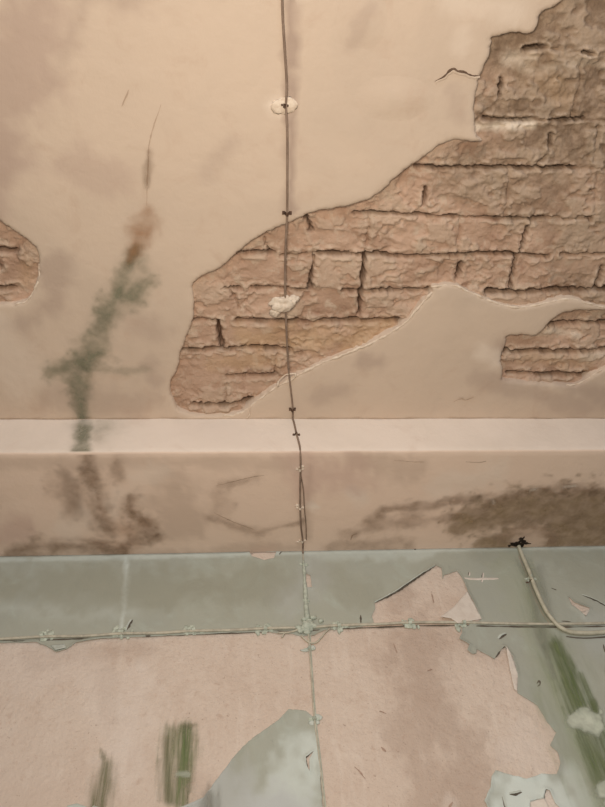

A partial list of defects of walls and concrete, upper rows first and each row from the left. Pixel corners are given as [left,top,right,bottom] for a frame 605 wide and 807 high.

spalling [0,221,40,305]
damp [127,246,138,267]
spalling [170,0,605,419]
damp [56,351,103,451]
damp [455,489,605,548]
damp [166,724,192,806]
peeling [0,565,560,807]
damp [552,640,605,804]